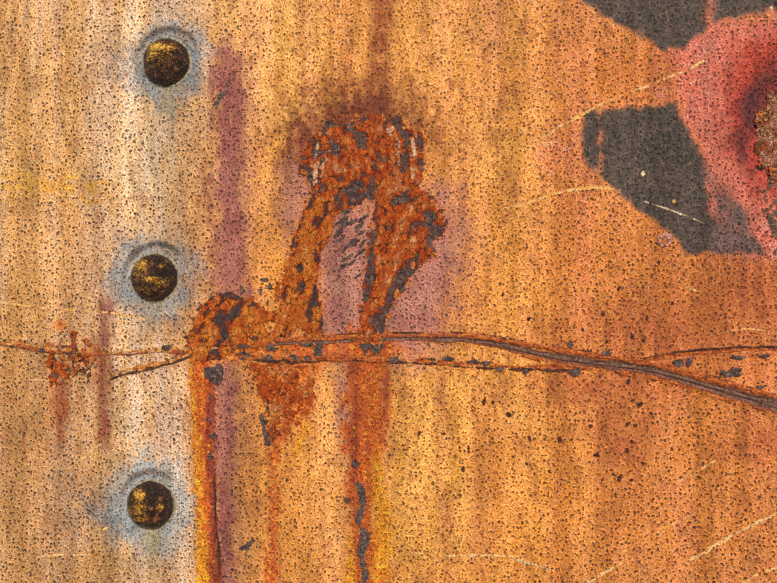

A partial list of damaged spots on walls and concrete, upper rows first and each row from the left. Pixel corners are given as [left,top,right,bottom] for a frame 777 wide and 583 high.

corrosion [0,285,124,561]
crack [0,340,191,380]
corrosion [183,0,497,583]
crack [210,331,777,414]
corrosion [457,254,777,583]